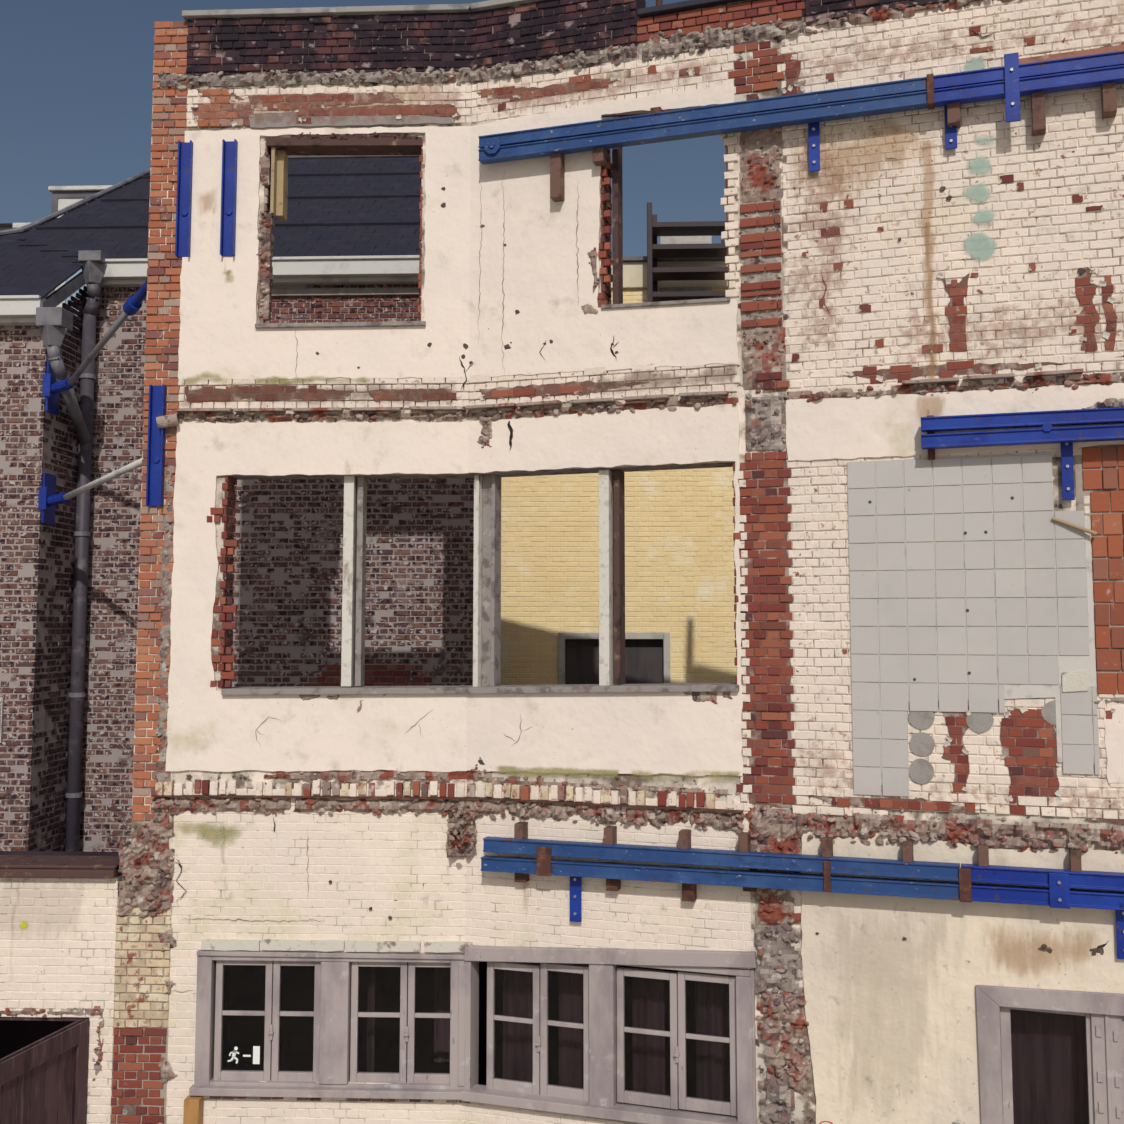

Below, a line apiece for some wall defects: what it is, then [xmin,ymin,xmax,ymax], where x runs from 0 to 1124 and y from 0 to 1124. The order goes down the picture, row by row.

flaking render [477,75,622,111]
flaking render [679,67,700,76]
flaking render [782,54,806,95]
crack [459,172,505,389]
flaking render [846,271,1066,384]
flaking render [1069,267,1122,357]
spalling [118,463,176,918]
flaking render [1000,706,1063,816]
spalling [157,928,176,952]